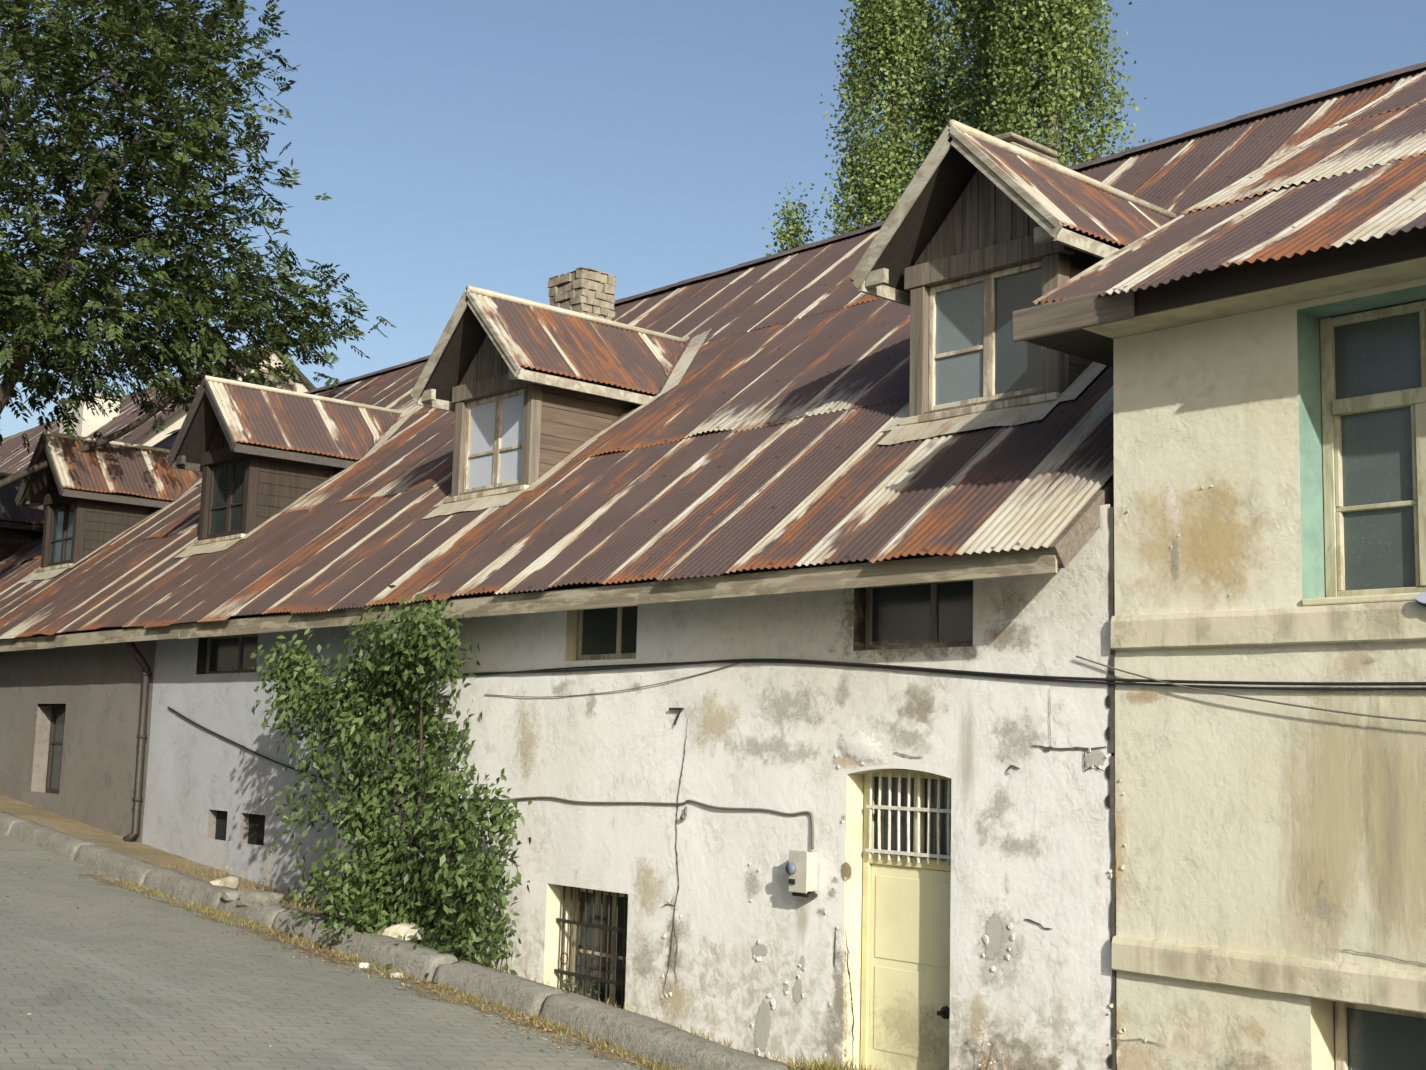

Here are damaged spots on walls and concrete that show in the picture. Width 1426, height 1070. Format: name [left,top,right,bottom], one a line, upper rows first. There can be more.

leakage [1296,709,1426,931]
spalling [981,913,1015,972]